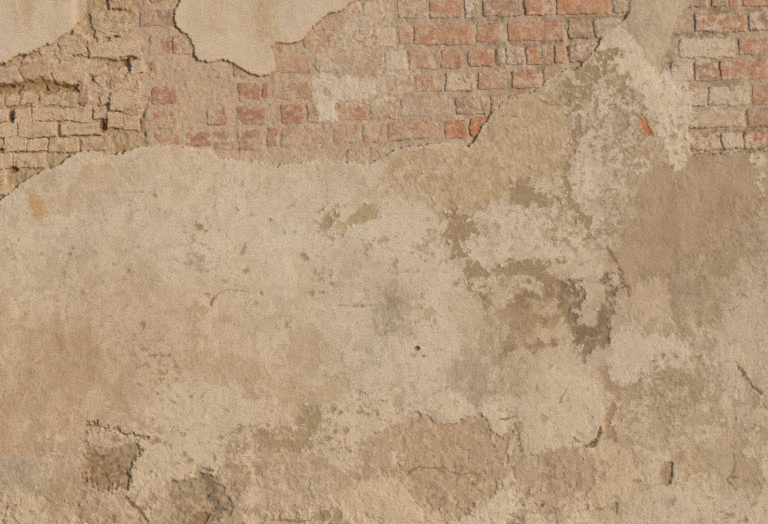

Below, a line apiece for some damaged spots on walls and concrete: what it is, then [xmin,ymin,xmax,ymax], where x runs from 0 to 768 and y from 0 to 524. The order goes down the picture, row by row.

spalling [0,75,80,98]
flaking render [0,0,89,67]
spalling [83,53,138,65]
flaking render [171,0,363,79]
peeling [311,44,688,365]
peeling [297,251,337,298]
peeling [130,321,212,405]
crack [734,361,768,411]
flaking render [78,418,168,494]
flaking render [144,370,517,524]
peeling [509,341,706,524]